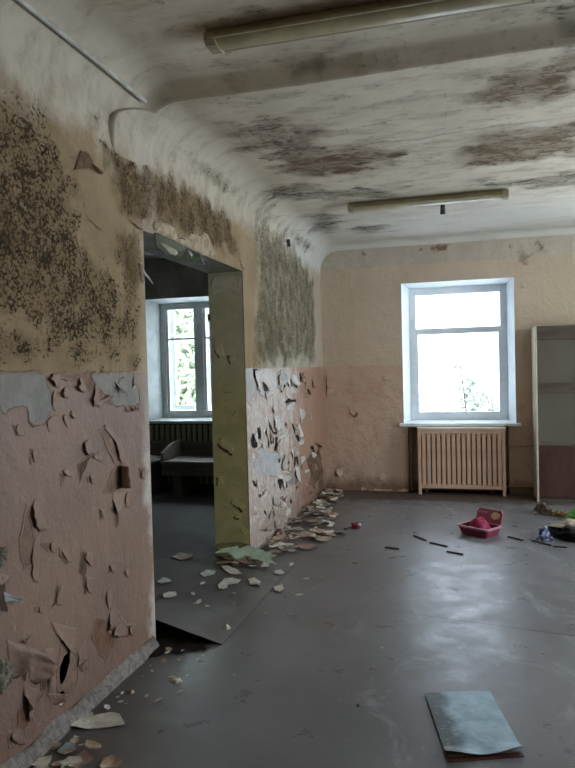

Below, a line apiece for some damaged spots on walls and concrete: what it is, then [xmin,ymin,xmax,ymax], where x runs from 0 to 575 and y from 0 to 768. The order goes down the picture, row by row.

leakage [479,56,575,107]
leakage [233,116,408,176]
leakage [459,123,575,168]
leakage [0,92,142,373]
leakage [102,144,237,255]
leakage [254,221,316,367]
peeling [0,369,141,436]
peeling [60,424,145,527]
peeling [230,367,325,533]
peeling [0,546,25,614]
peeling [19,500,93,595]
peeling [0,584,136,749]